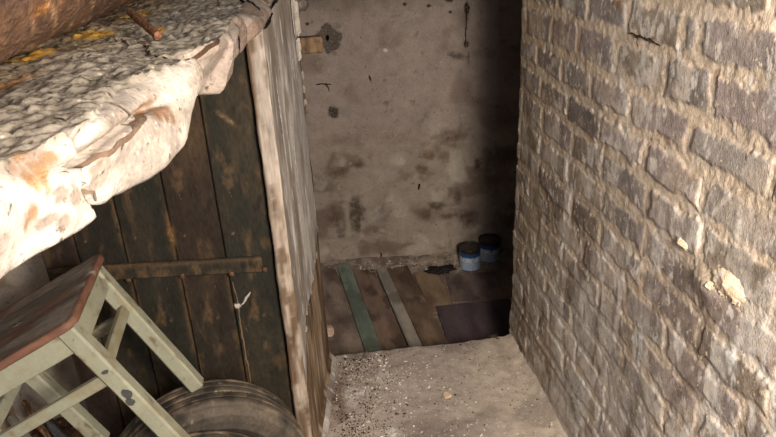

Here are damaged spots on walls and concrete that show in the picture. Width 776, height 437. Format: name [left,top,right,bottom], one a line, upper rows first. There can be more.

crack [112,36,168,59]
crack [192,36,240,59]
corrosion [12,153,57,194]
crack [81,182,97,202]